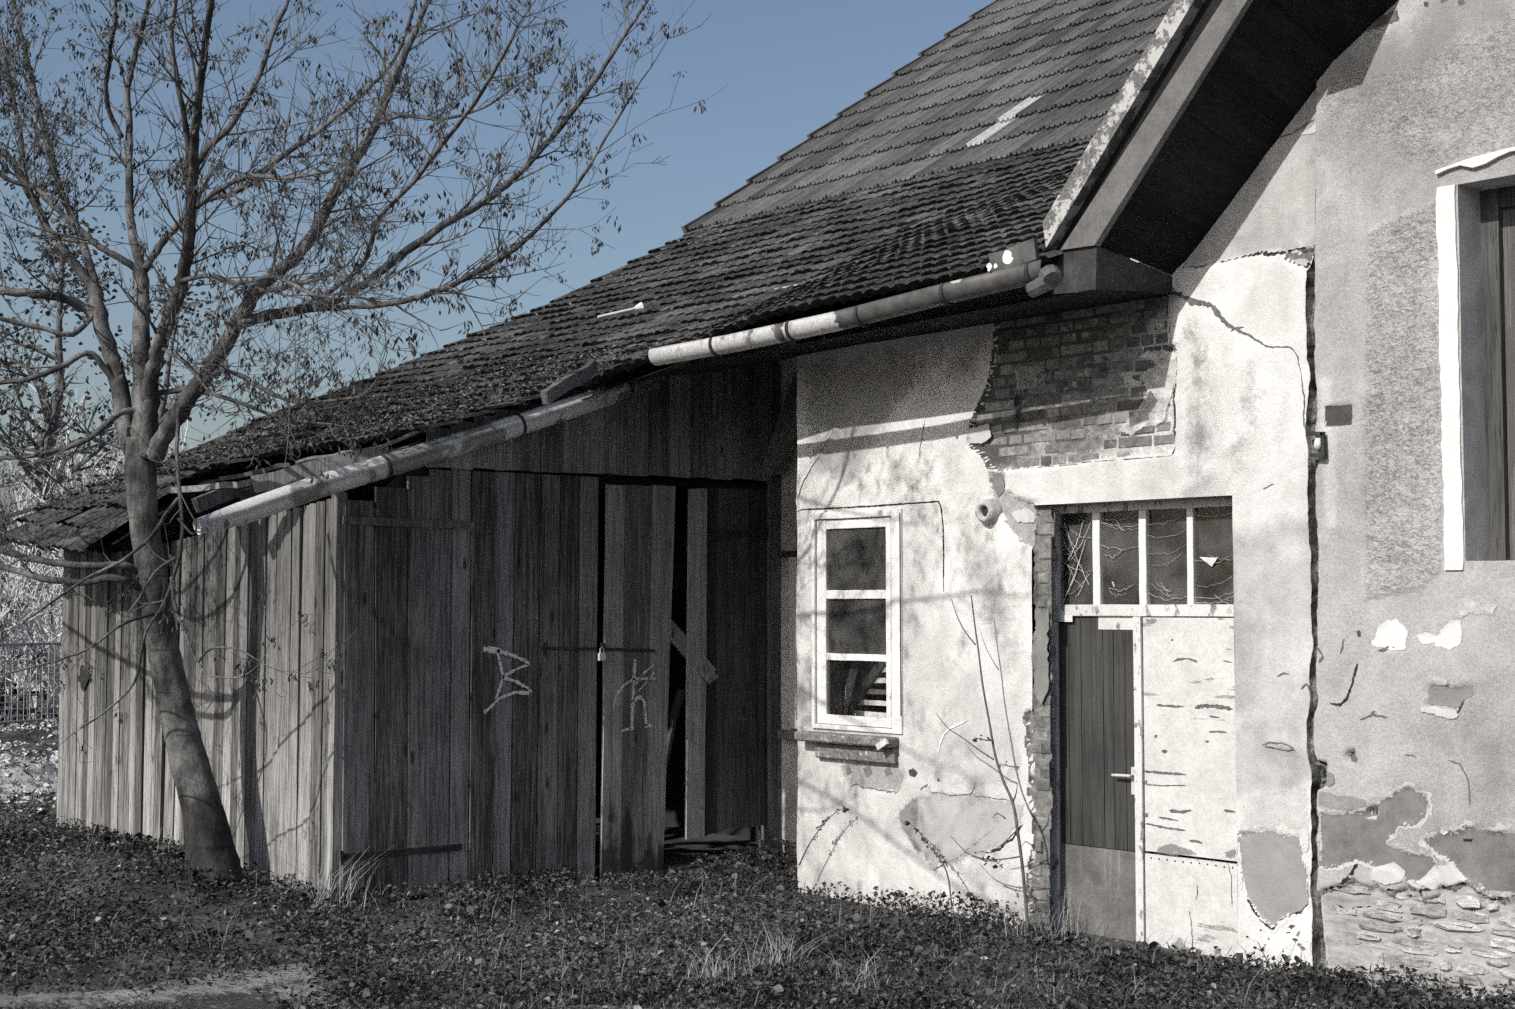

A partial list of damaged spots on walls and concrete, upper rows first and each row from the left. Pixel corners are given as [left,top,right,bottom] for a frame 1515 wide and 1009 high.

crack [1172,193,1515,977]
flaking render [965,295,1177,932]
flaking render [1421,676,1474,719]
peeling [1156,704,1232,742]
flaking render [842,762,903,793]
peeling [1143,770,1186,786]
peeling [1144,809,1202,856]
flaking render [1224,762,1515,1008]